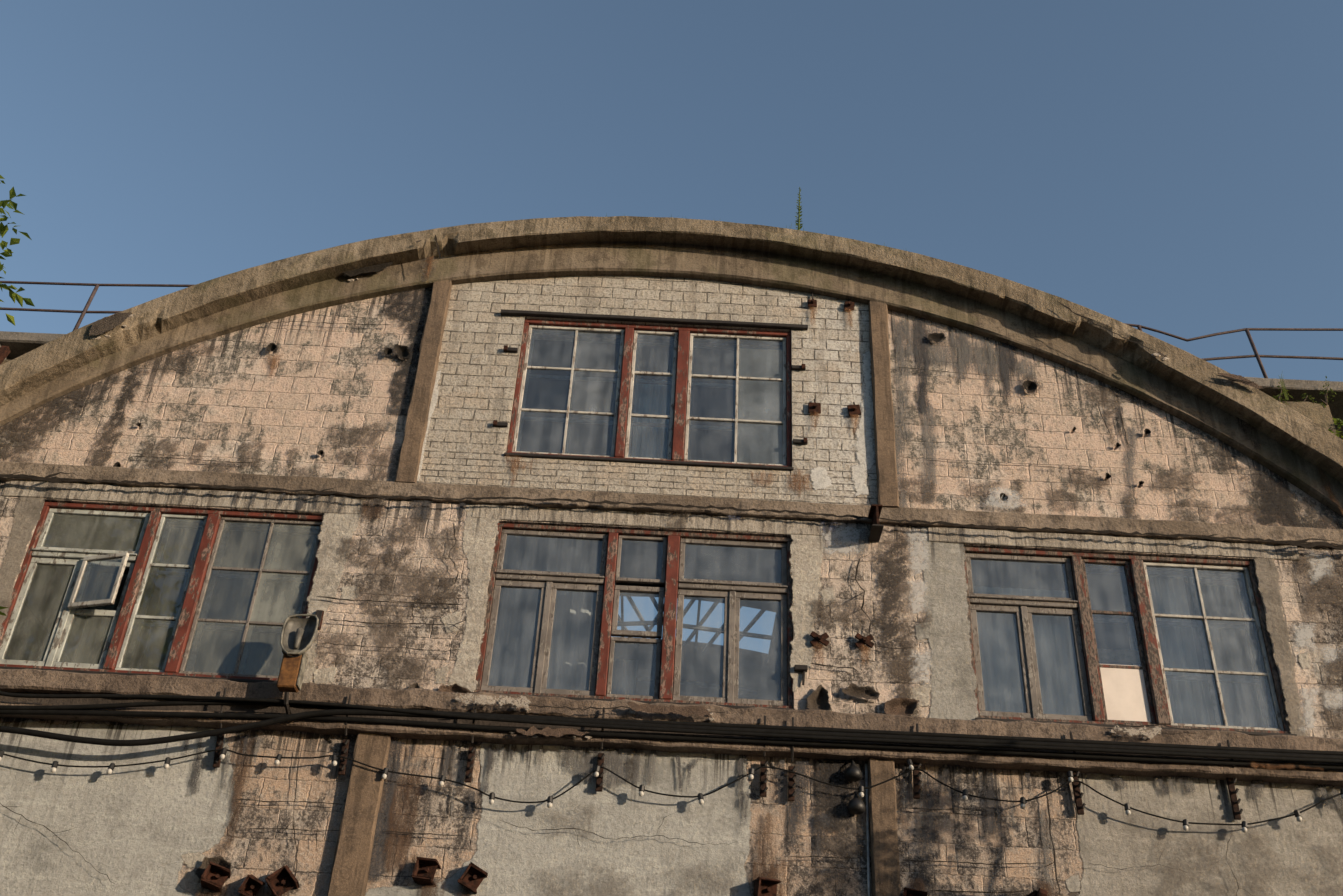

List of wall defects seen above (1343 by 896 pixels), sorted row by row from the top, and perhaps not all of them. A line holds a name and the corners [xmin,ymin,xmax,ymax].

water stain [0,339,220,466]
water stain [138,438,265,472]
water stain [329,256,437,481]
water stain [892,316,1035,507]
water stain [1048,468,1110,510]
water stain [1088,385,1161,519]
water stain [1153,426,1343,529]
water stain [233,491,466,690]
water stain [810,520,932,717]
crack [0,803,115,884]
crack [500,812,741,845]
water stain [777,757,866,896]